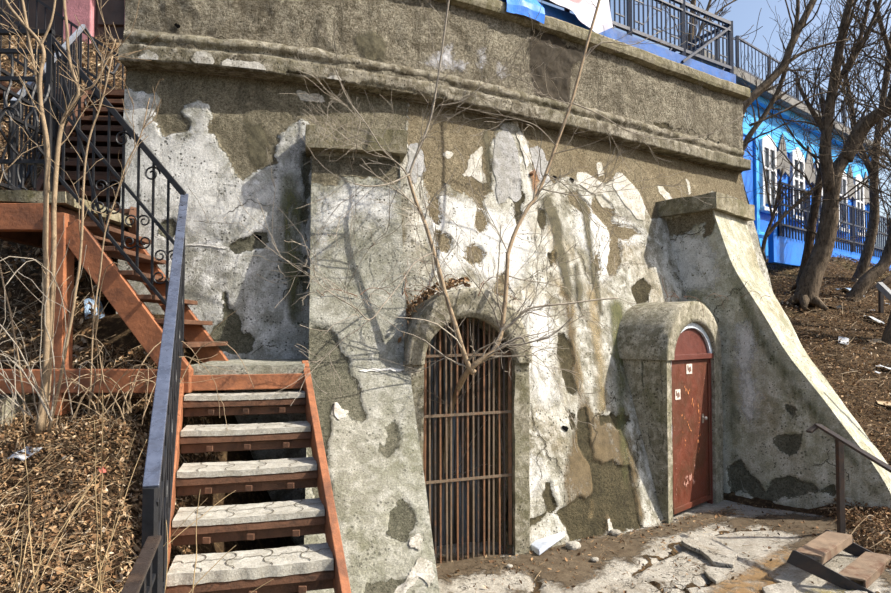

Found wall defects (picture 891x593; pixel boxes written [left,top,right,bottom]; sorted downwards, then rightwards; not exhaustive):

spalling [126,50,748,292]
leakage [281,177,302,320]
spalling [309,326,367,464]
leakage [543,195,644,520]
spalling [726,459,836,503]
spalling [772,433,803,456]
spalling [365,498,435,593]
crack [531,579,543,593]
crack [632,542,713,593]
crack [715,526,791,536]